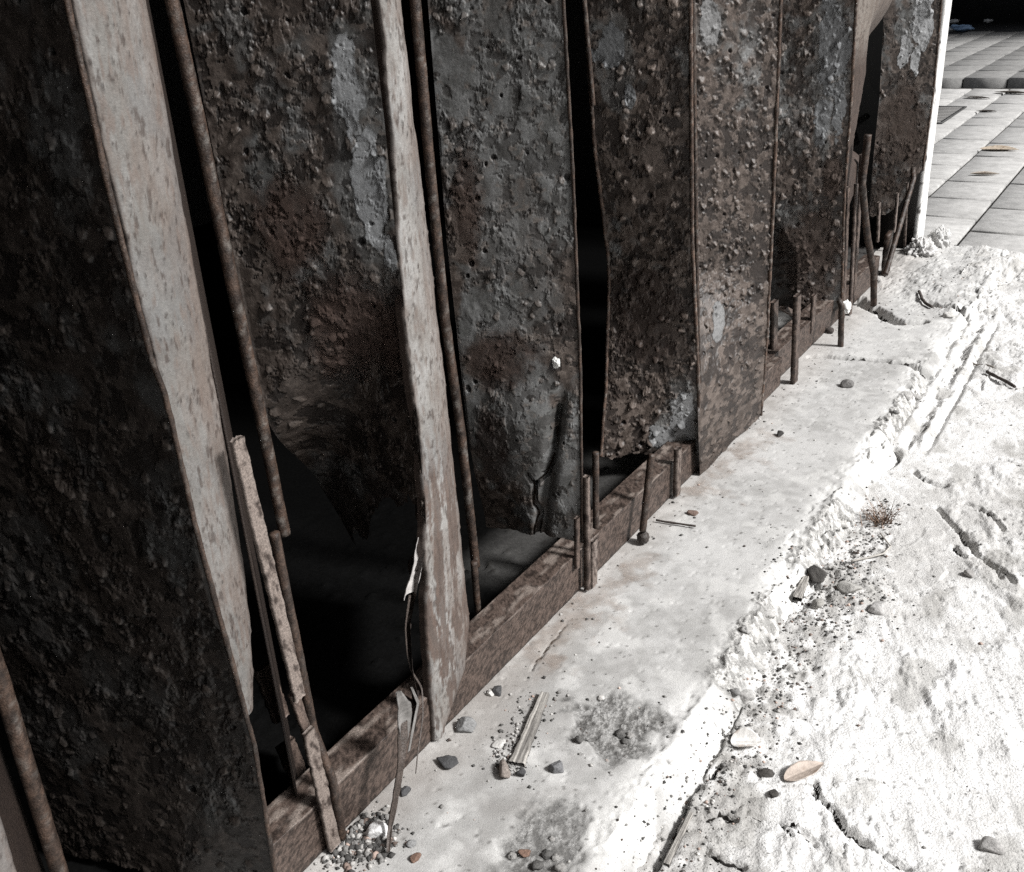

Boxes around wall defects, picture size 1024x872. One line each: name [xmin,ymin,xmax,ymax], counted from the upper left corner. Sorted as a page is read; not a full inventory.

rust [874,85,929,209]
rust [776,158,843,302]